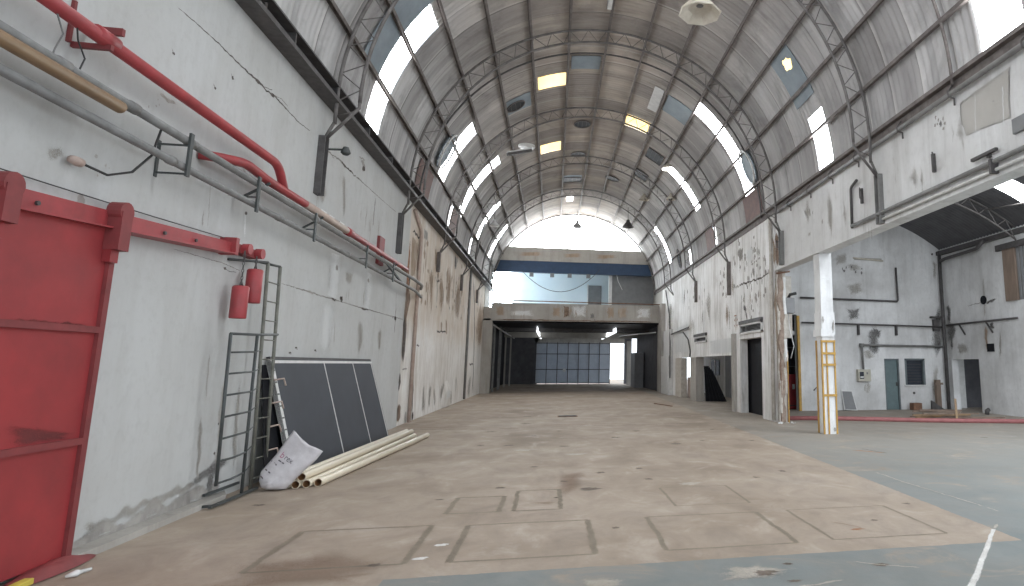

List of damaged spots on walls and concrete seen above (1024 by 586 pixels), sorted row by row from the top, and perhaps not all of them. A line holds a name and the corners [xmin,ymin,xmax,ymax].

crack [180,9,310,131]
water stain [423,250,461,318]